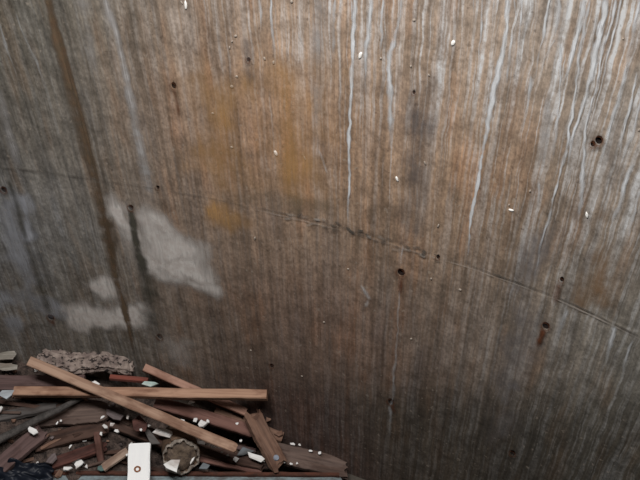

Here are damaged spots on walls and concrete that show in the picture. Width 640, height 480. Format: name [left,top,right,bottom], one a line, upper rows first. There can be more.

efflorescence [347,0,357,203]
efflorescence [364,2,372,71]
efflorescence [387,31,396,127]
efflorescence [469,0,513,239]
efflorescence [552,0,621,208]
efflorescence [621,74,640,138]
leakage [52,302,152,333]
efflorescence [89,276,119,299]
leakage [107,197,221,296]
crack [286,214,391,242]